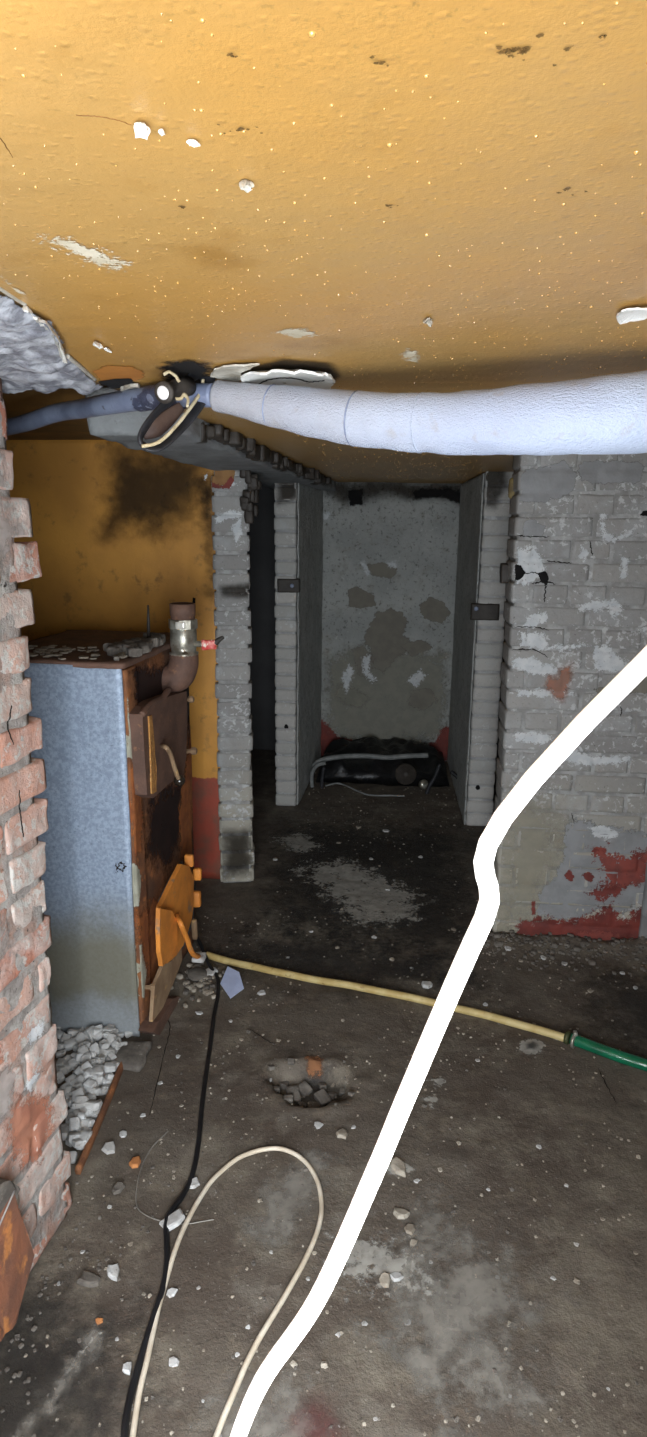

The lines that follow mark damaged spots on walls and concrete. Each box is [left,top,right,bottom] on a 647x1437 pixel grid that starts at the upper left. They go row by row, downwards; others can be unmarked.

peeling [616,307,647,324]
flaking render [0,287,145,395]
flaking render [348,562,397,609]
flaking render [419,597,451,624]
peeling [510,544,629,699]
spalling [629,676,647,694]